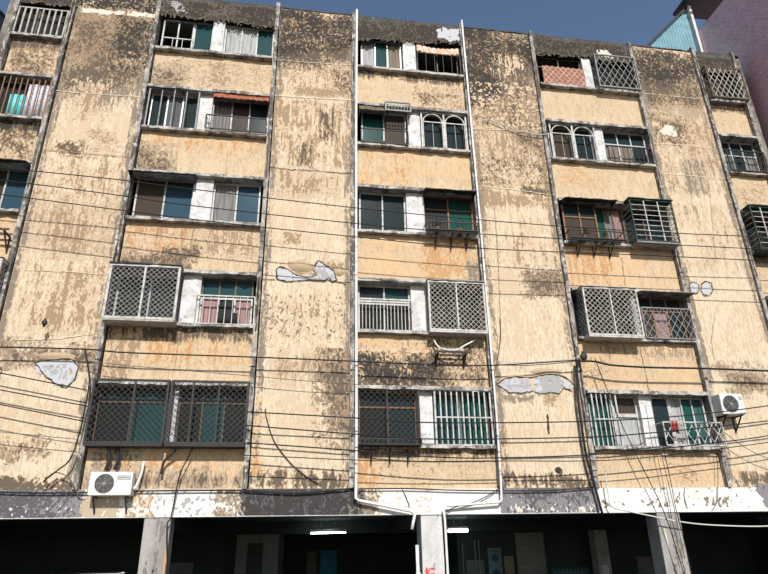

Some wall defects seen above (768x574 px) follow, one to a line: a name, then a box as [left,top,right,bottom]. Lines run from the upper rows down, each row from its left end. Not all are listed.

peeling [436,27,460,43]
damp [533,34,768,396]
damp [0,0,641,518]
peeling [277,261,335,282]
peeling [690,282,713,295]
peeling [34,360,78,386]
peeling [498,375,574,396]
damp [594,450,719,463]
spalling [641,487,749,511]
spalling [749,483,768,508]